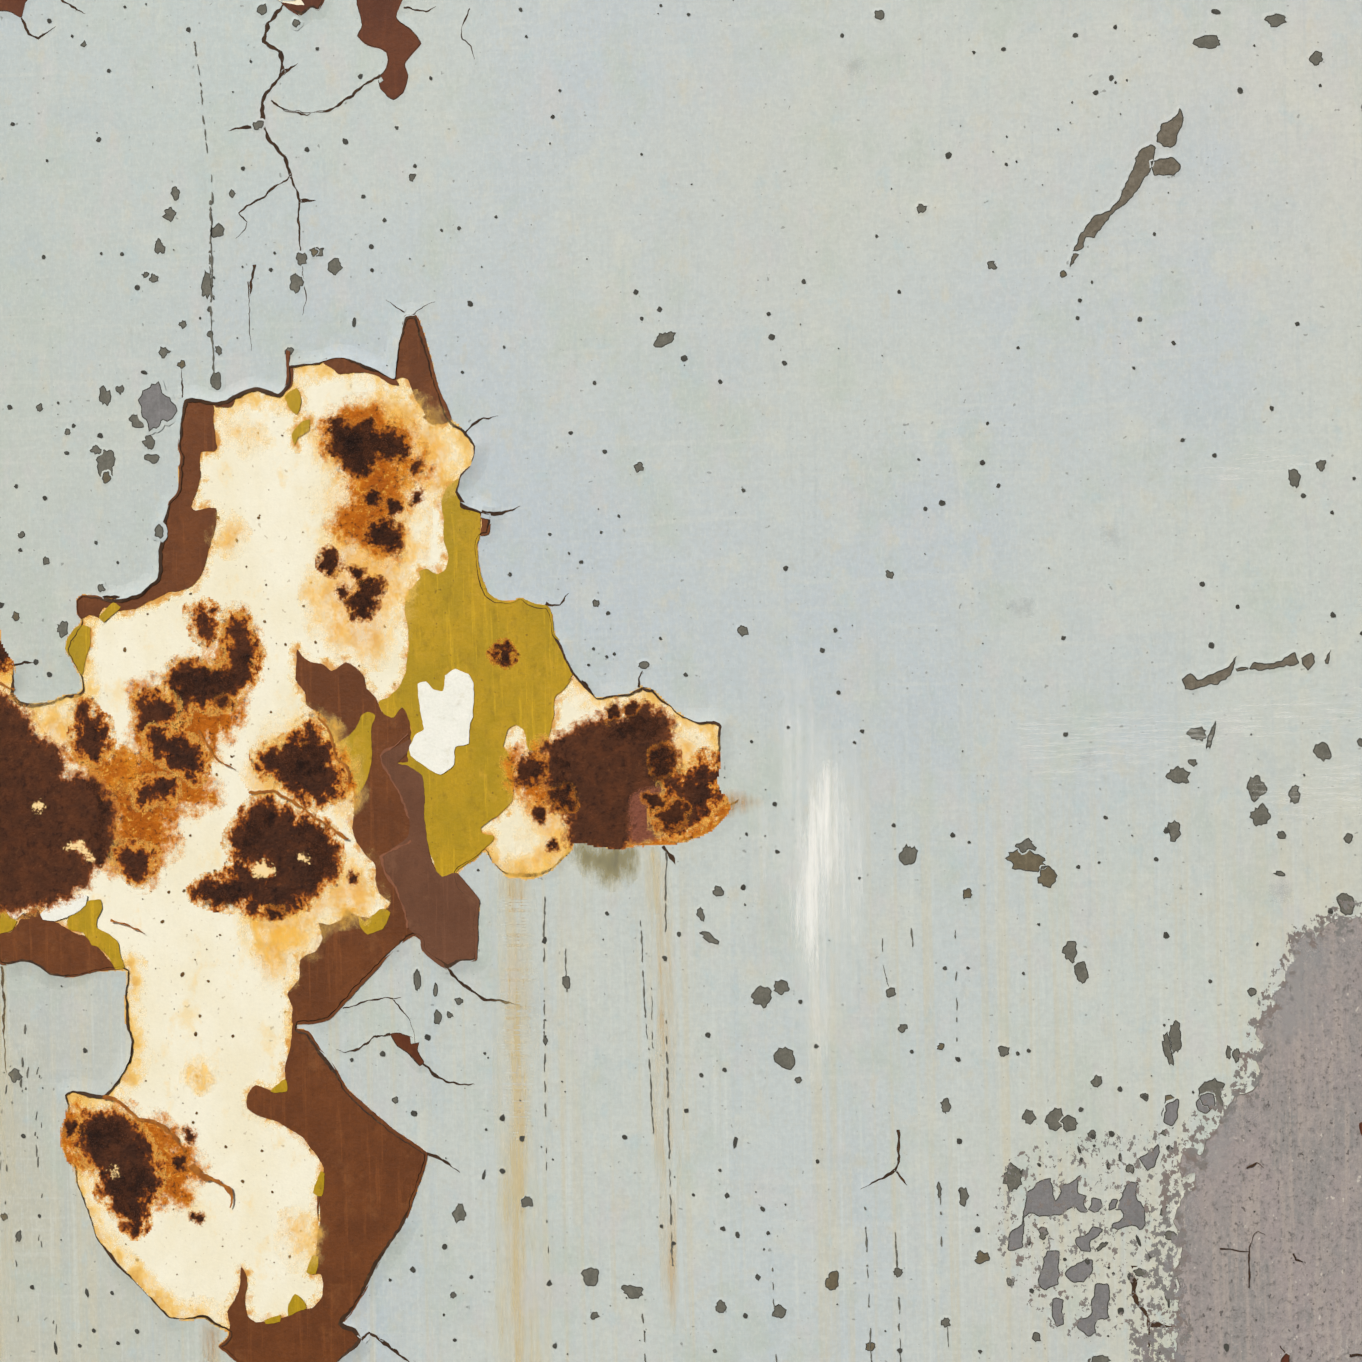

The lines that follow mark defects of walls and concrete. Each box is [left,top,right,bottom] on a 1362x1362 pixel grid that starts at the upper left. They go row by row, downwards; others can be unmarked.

peeling [0,0,57,42]
peeling [284,0,437,115]
spalling [1149,104,1187,180]
crack [228,1,323,372]
spalling [1234,646,1335,675]
peeling [1162,717,1220,787]
peeling [1309,738,1335,765]
peeling [0,302,743,1362]
peeling [1002,835,1061,891]
peeling [1243,772,1304,841]
crack [342,995,419,1044]
peeling [971,888,1362,1362]